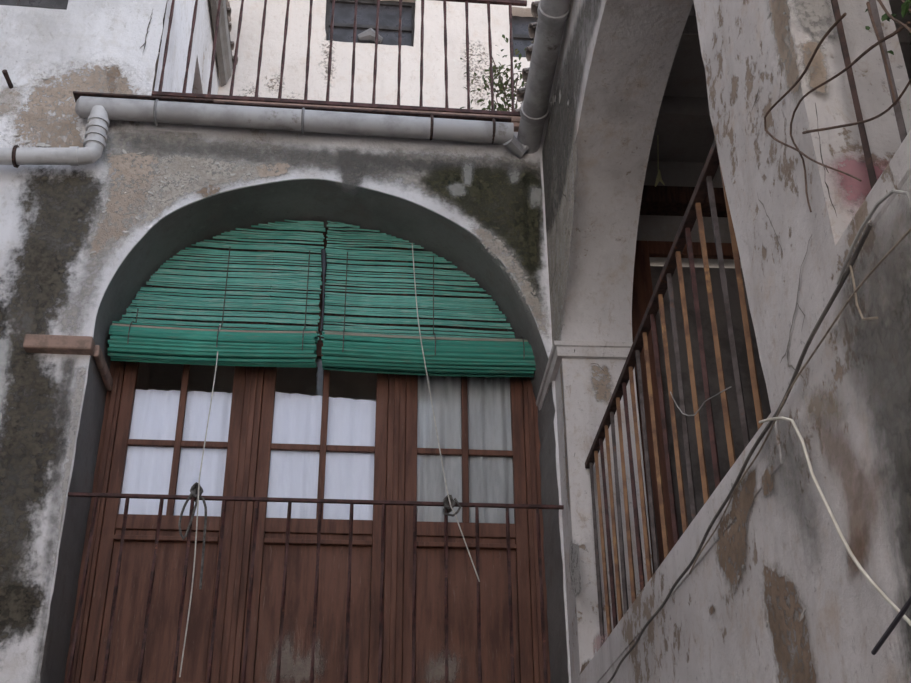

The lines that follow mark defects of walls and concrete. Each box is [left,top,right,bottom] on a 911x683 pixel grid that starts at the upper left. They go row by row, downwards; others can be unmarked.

peeling [0,63,138,148]
water stain [164,0,601,271]
water stain [53,359,73,483]
peeling [714,465,773,585]
water stain [0,583,45,628]
peeling [763,565,816,683]